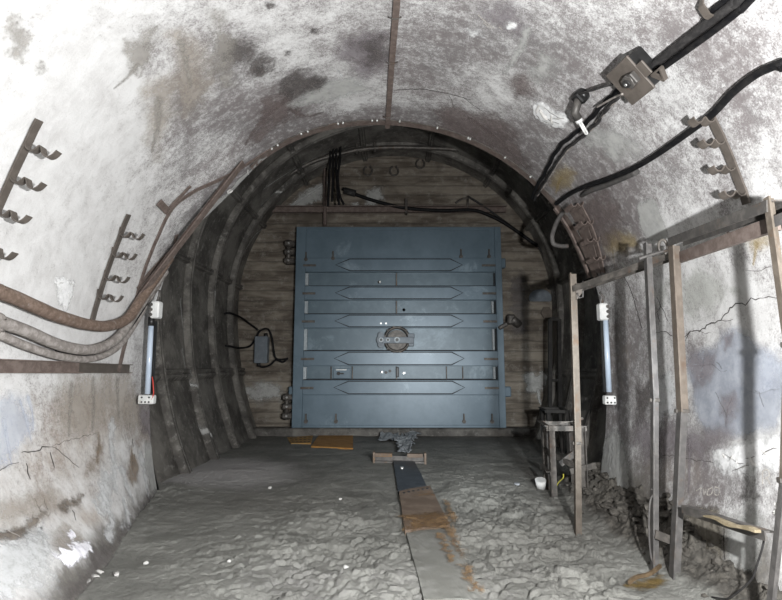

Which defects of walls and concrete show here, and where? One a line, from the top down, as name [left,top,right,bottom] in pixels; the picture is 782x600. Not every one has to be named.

water stain [116,30,153,87]
water stain [213,34,275,85]
water stain [245,33,386,145]
flaking render [54,277,75,310]
crack [624,277,775,341]
crack [0,433,95,478]